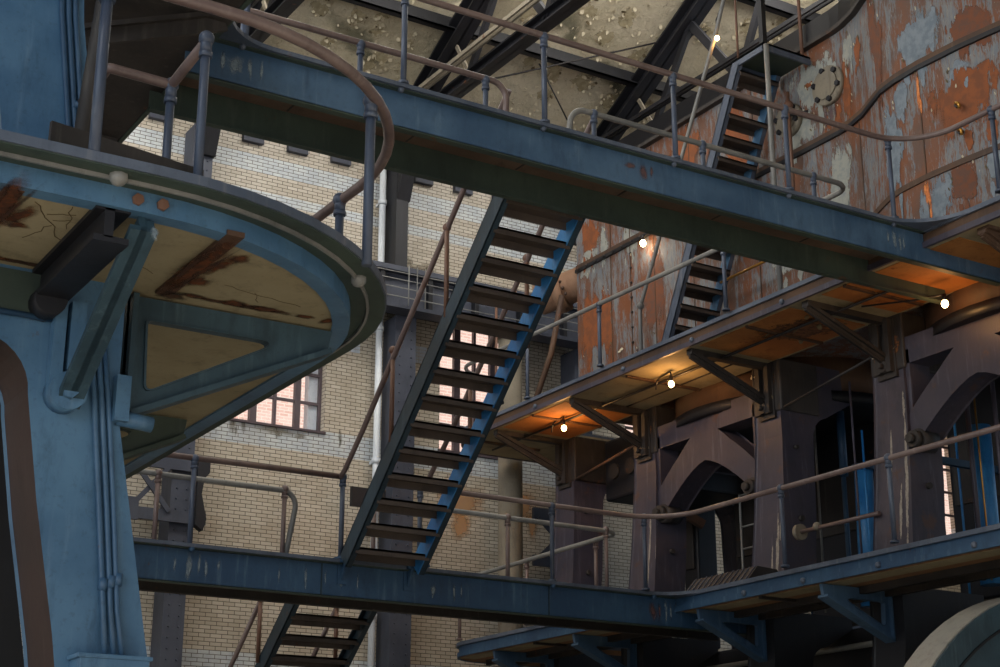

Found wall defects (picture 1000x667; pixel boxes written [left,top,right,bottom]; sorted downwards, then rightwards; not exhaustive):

peeling [337,5,444,81]
peeling [781,31,853,164]
peeling [884,3,939,218]
rust [916,4,1000,211]
rust [0,179,34,228]
crack [22,202,76,240]
peeling [623,228,637,266]
peeling [827,142,852,205]
rust [924,183,932,218]
peeling [919,172,952,219]
peeling [982,136,1000,197]
rust [157,242,332,323]